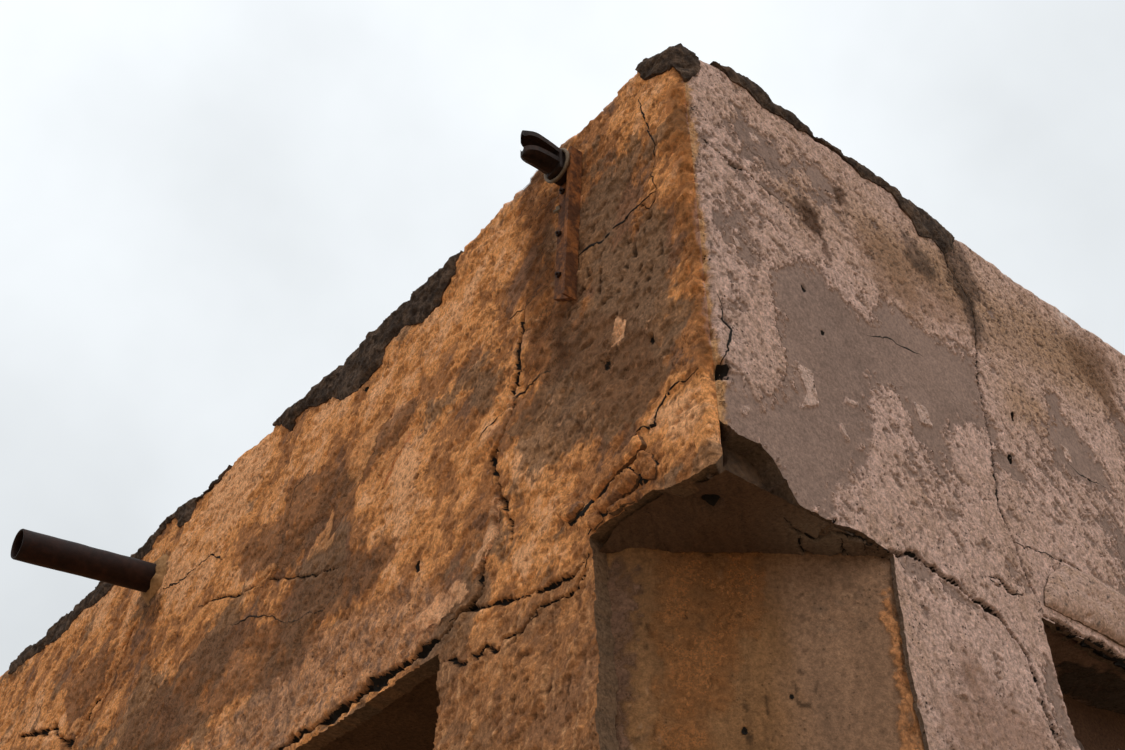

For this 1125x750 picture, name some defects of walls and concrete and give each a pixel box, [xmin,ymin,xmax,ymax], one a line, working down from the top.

crack [578,99,657,257]
crack [632,294,733,437]
peeling [707,209,1029,524]
spalling [556,435,659,535]
crack [783,254,1125,746]
flaking render [1042,652,1125,748]